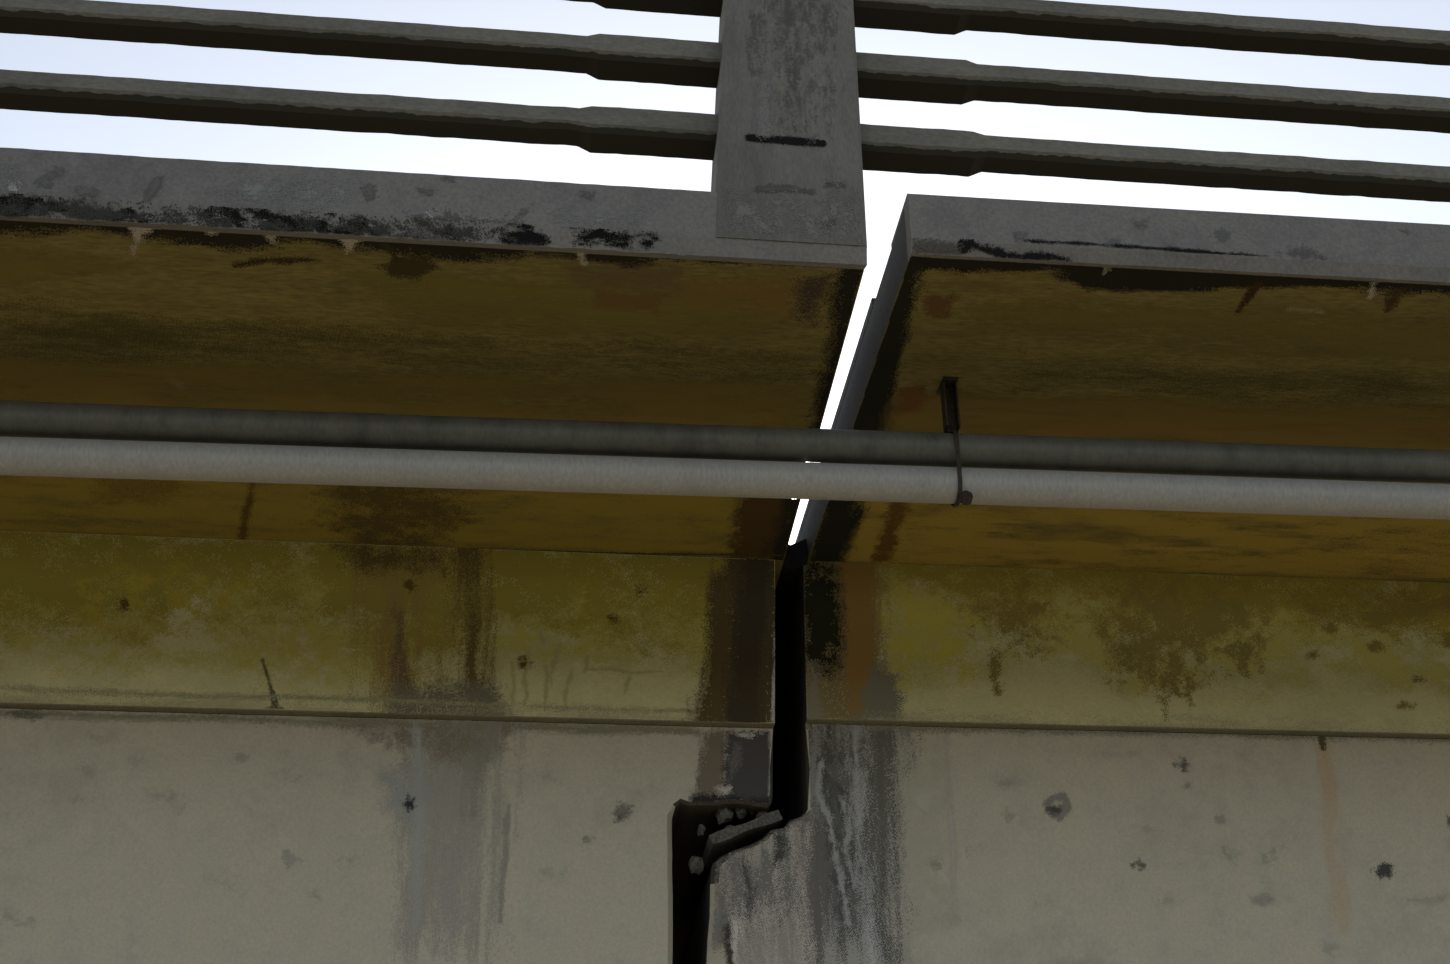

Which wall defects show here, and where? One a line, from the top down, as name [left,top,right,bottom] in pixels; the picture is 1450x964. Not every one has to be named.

water stain [0,475,800,964]
water stain [711,500,1450,964]